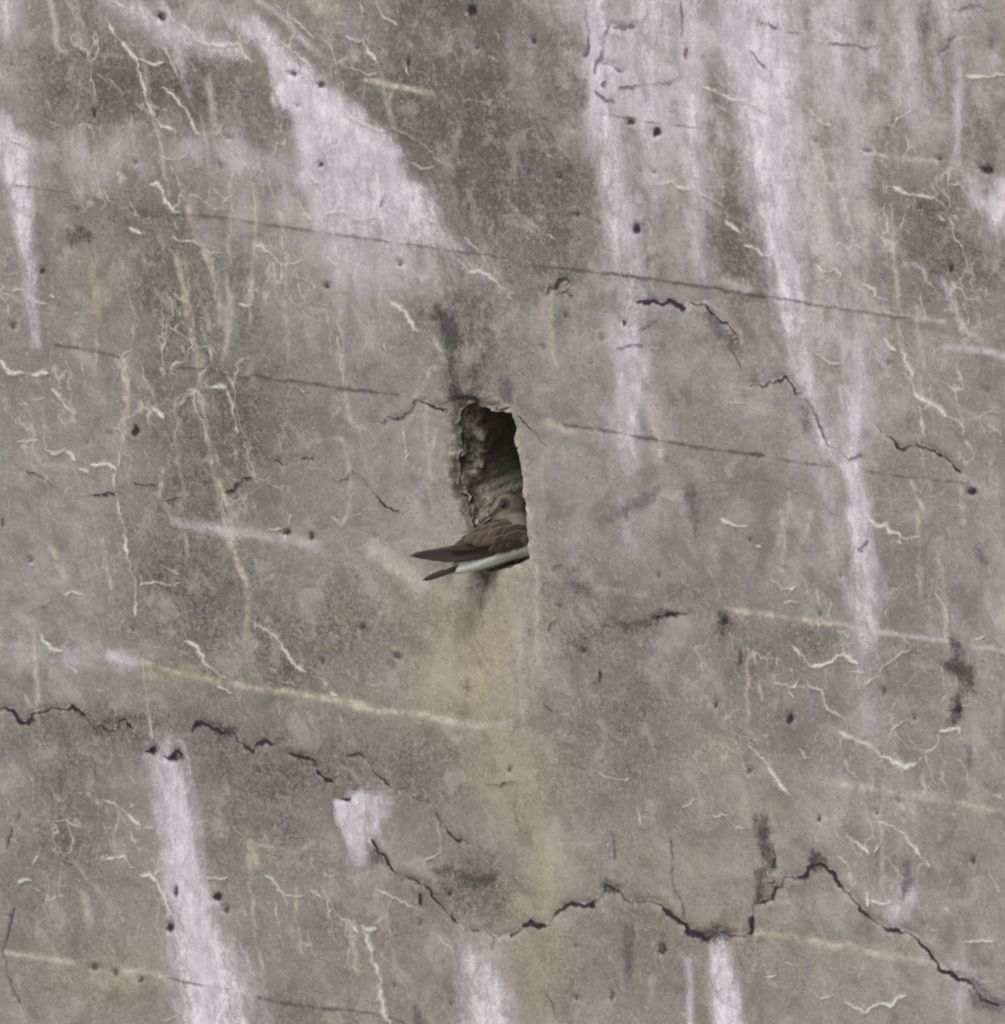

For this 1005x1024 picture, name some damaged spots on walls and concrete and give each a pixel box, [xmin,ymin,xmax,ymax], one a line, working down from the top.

leakage [0,114,39,343]
leakage [125,1,451,277]
crack [380,397,463,457]
crack [614,258,862,461]
leakage [718,0,878,653]
crack [876,338,963,473]
crack [0,704,351,801]
leakage [151,740,249,1024]
leakage [334,791,388,866]
crack [370,821,999,1006]
leakage [703,923,742,1024]
crack [827,995,906,1013]